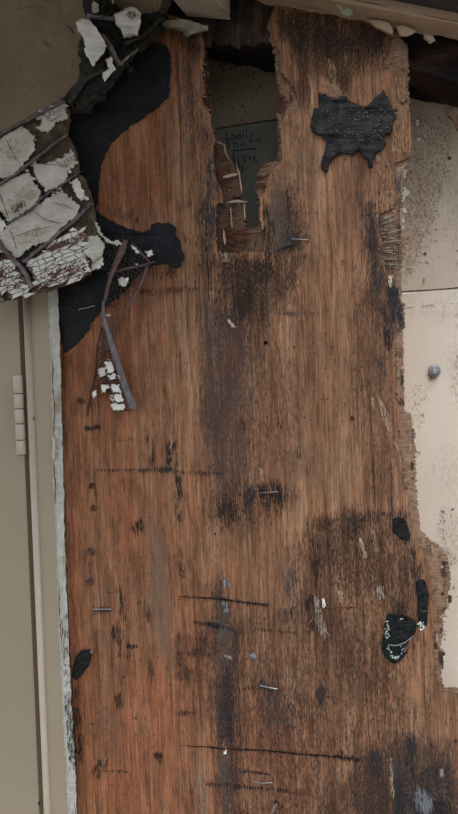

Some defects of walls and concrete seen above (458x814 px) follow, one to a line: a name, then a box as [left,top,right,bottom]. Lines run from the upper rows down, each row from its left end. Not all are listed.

crack [0,195,72,249]